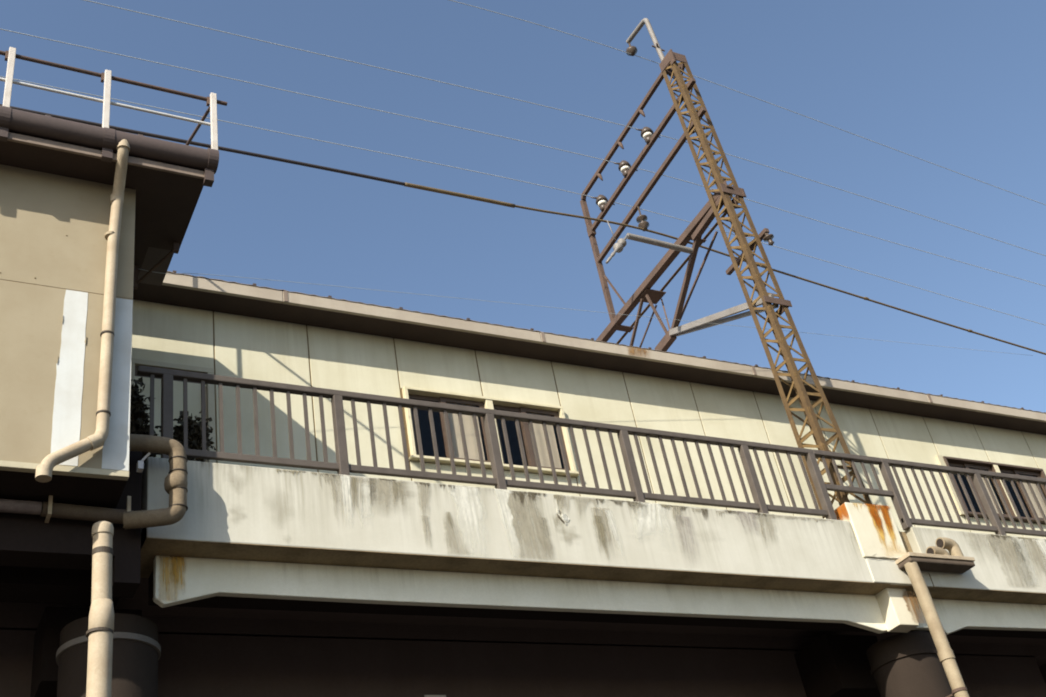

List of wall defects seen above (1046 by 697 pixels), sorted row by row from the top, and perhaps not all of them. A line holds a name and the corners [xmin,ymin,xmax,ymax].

damp [277,469,484,553]
damp [496,491,829,558]
corrosion [834,503,896,546]